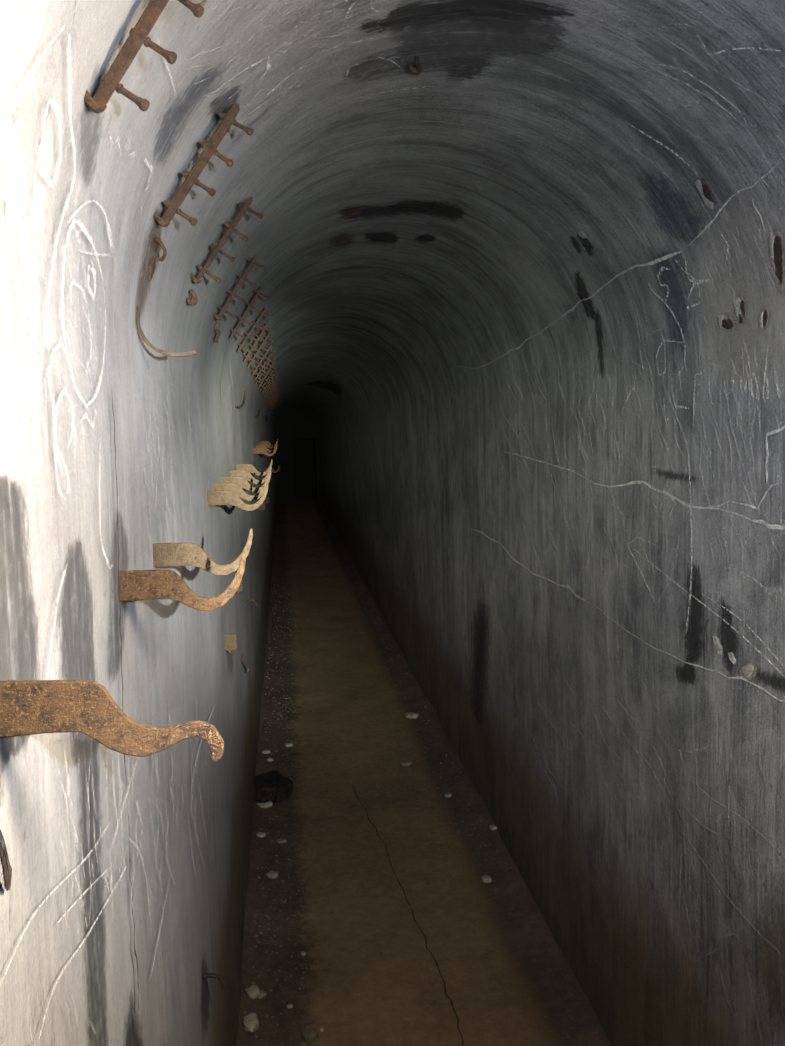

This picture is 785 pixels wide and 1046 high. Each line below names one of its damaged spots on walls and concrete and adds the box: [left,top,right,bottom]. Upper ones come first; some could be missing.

water stain [344,0,576,80]
crack [455,163,779,369]
flaking render [694,178,716,209]
water stain [0,477,38,681]
water stain [59,541,95,681]
crack [112,398,123,710]
crack [502,425,785,530]
water stain [676,565,738,684]
flaking render [0,843,10,891]
water stain [70,732,108,1046]
crack [124,754,139,1007]
crack [351,784,464,1046]